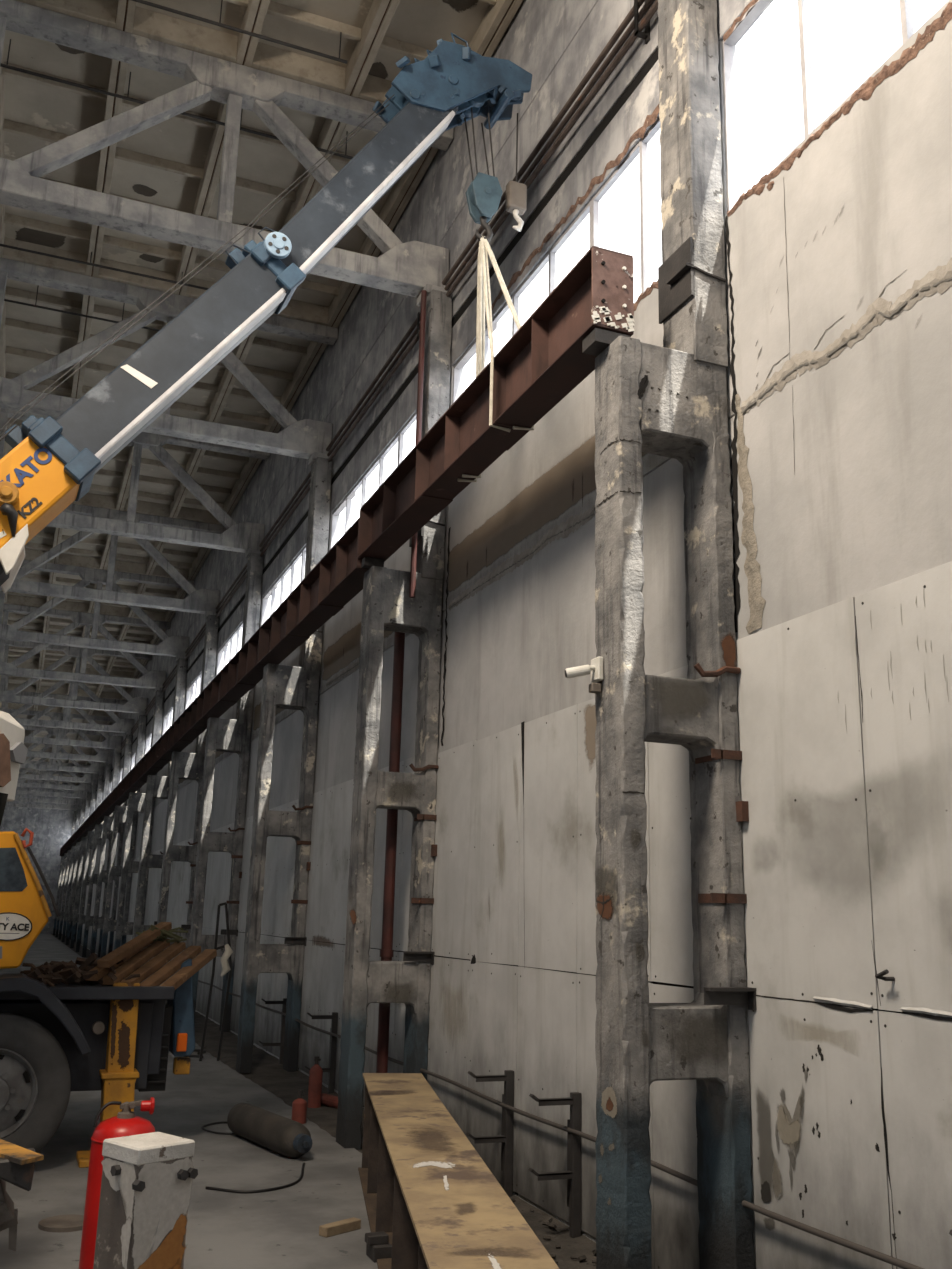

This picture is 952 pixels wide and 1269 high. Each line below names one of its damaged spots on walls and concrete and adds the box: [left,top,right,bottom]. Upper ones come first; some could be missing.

spalling [727,2,952,217]
crack [725,216,766,634]
rust [721,635,736,667]
peeling [776,1045,824,1218]